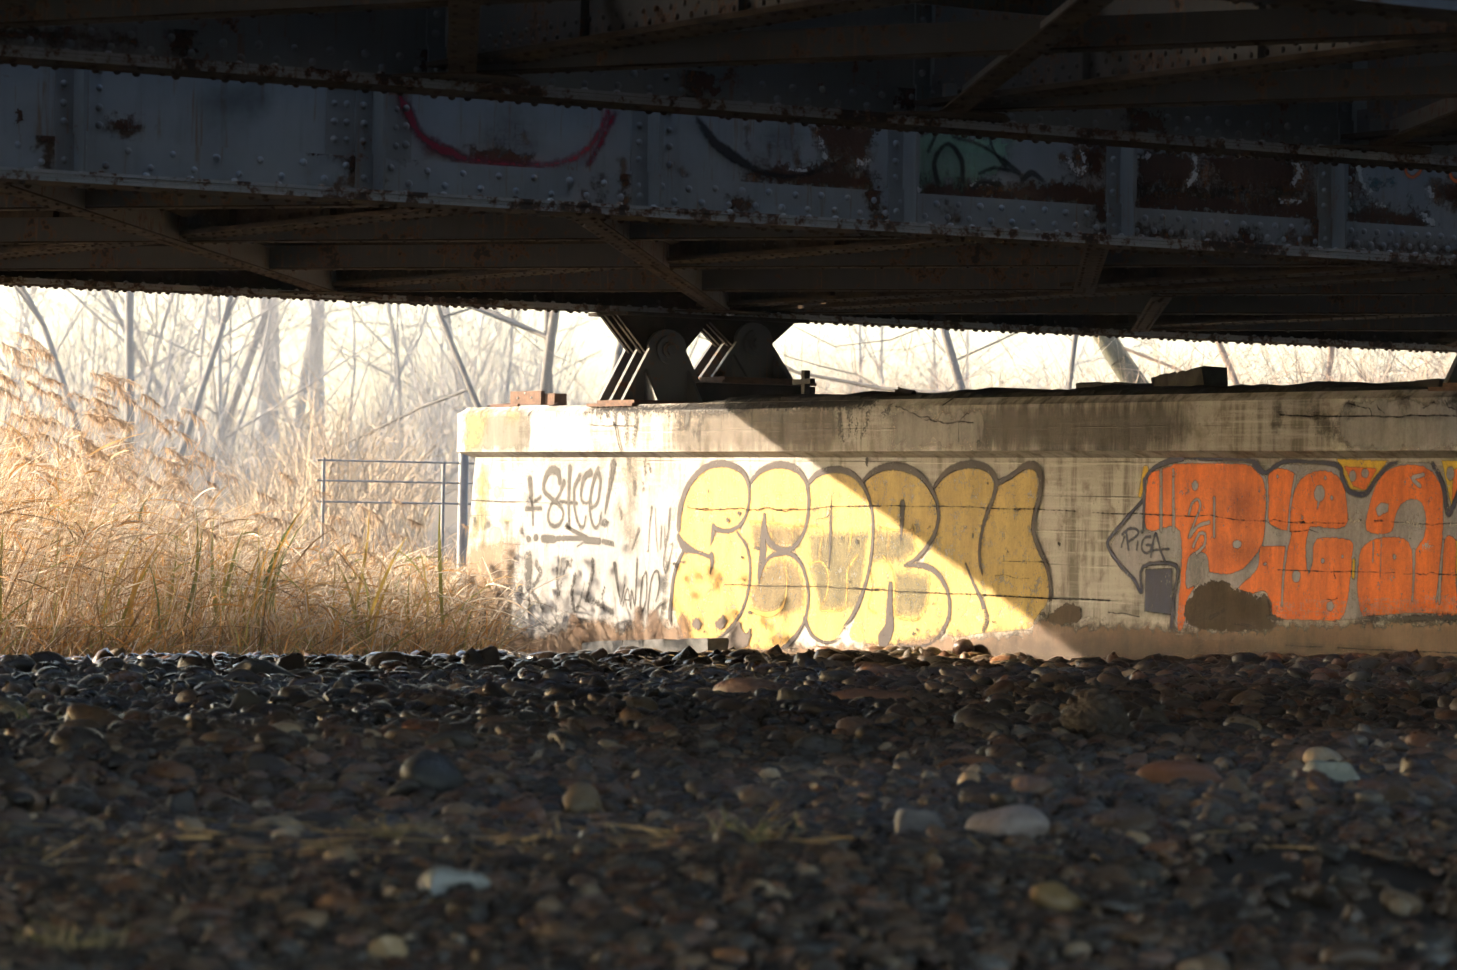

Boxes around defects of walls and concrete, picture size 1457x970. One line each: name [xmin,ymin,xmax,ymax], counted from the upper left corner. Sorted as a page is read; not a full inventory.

corrosion [104,112,142,138]
corrosion [36,135,55,169]
damp [463,406,690,654]
damp [736,617,1457,661]